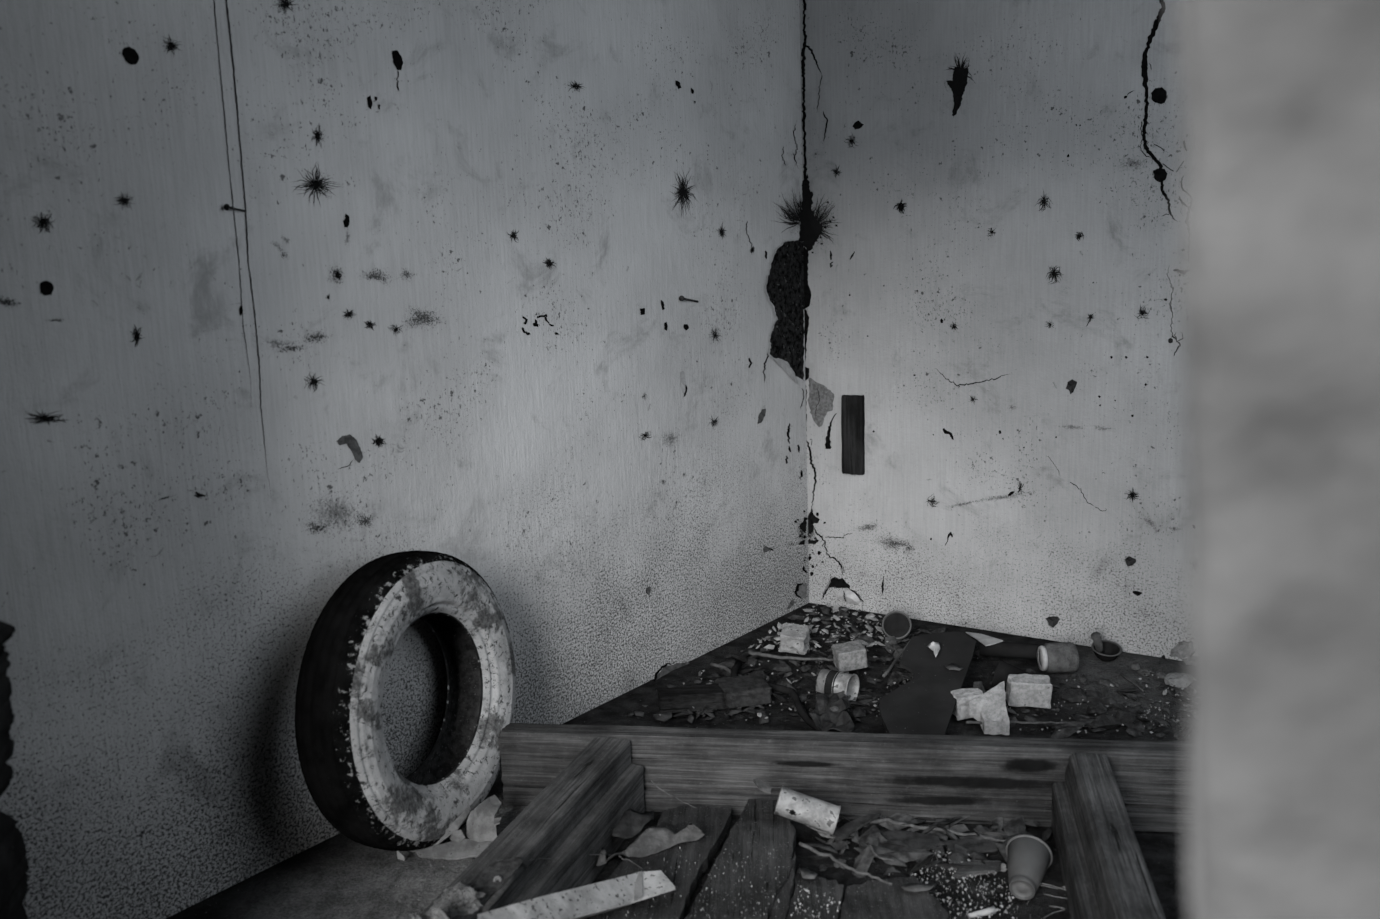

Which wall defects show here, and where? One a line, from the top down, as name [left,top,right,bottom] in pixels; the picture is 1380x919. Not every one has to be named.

crack [1140,0,1182,220]
flaking render [748,240,834,427]
crack [1164,268,1182,355]
crack [785,389,852,577]